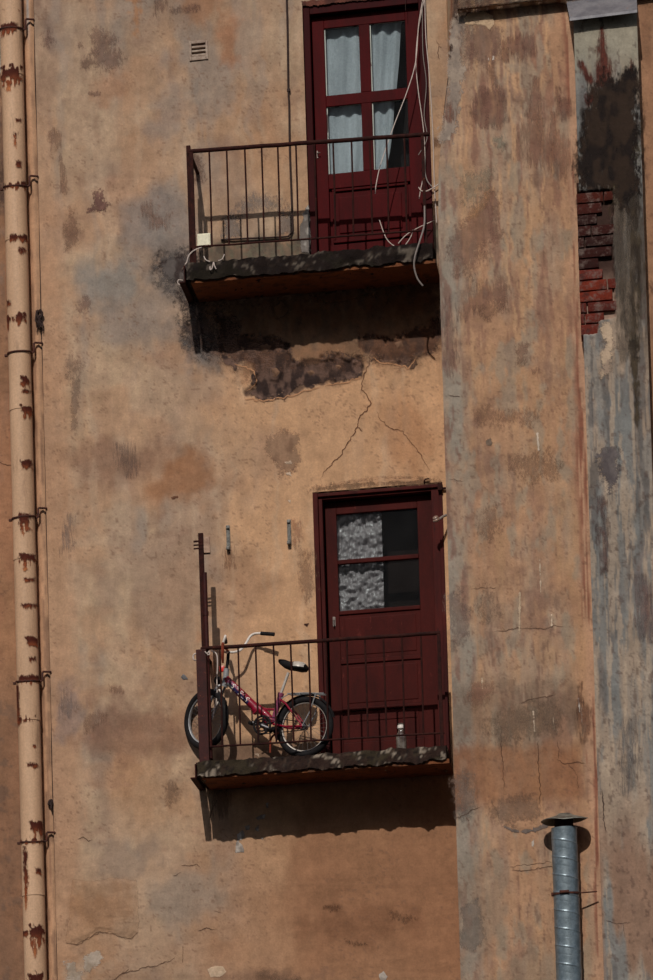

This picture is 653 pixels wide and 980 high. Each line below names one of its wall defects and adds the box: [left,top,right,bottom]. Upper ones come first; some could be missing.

peeling [199,191,507,402]
flaking render [576,183,617,342]
crack [320,345,426,479]